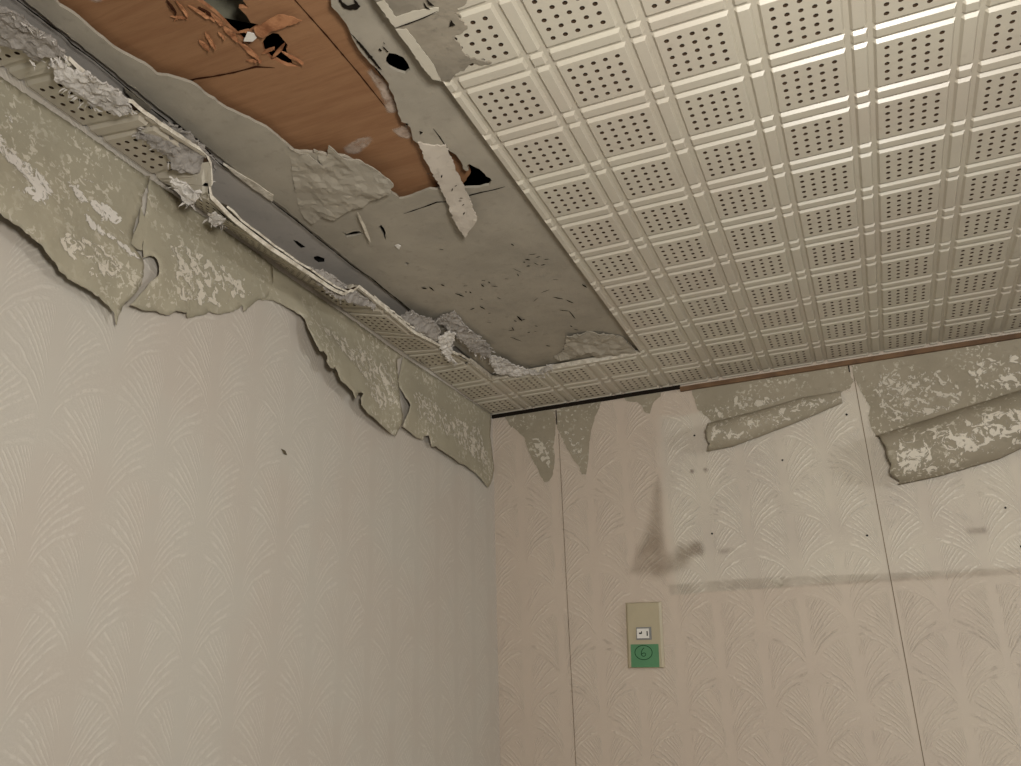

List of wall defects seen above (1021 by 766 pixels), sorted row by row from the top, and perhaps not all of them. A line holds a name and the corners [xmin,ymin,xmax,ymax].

peeling [375,0,492,82]
peeling [221,203,349,292]
peeling [692,339,1021,439]
peeling [505,402,601,482]